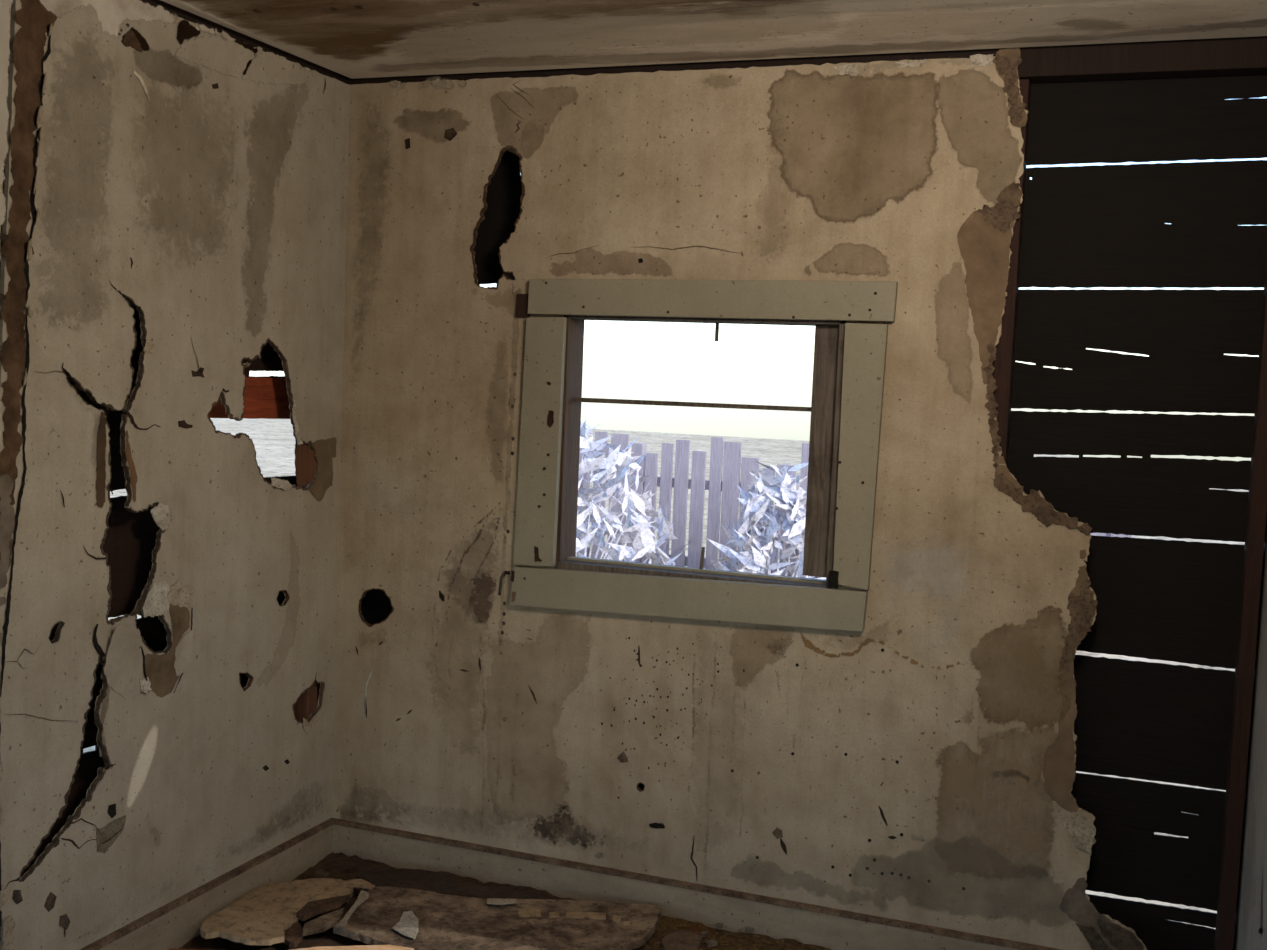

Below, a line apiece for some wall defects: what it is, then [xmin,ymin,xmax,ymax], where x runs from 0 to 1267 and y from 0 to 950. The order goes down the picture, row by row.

peeling [833,64,858,76]
peeling [895,59,927,68]
peeling [970,48,1028,127]
crack [35,257,160,512]
peeling [0,0,336,699]
peeling [957,181,1092,535]
peeling [970,550,1098,854]
crack [4,624,115,889]
spalling [96,804,126,853]
leakage [533,804,588,848]
peeling [44,892,70,935]
spalling [1059,878,1144,950]